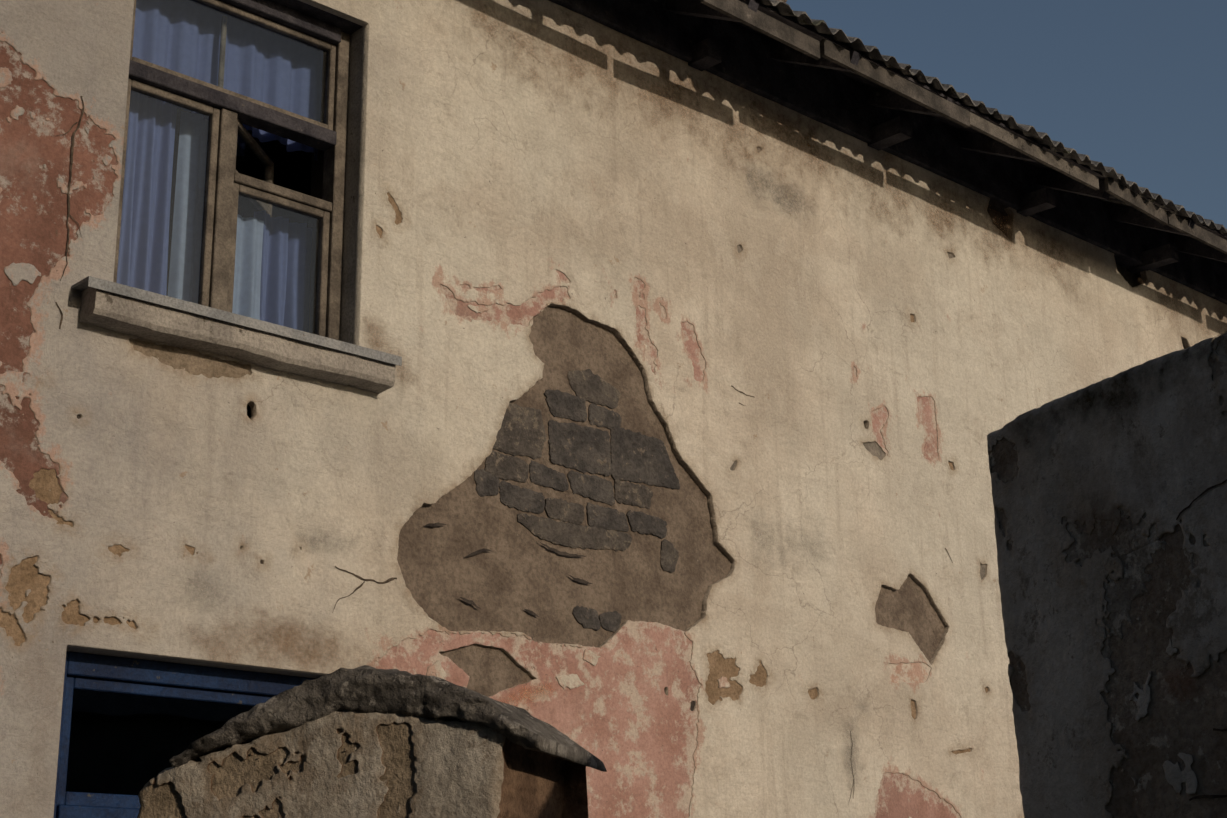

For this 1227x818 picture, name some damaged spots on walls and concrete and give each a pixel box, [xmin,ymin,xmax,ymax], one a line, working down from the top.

peeling [0,41,118,527]
peeling [989,438,1019,483]
crack [1176,479,1227,520]
flaking render [374,270,767,818]
peeling [0,554,50,646]
crack [332,566,397,613]
flaking render [875,575,945,663]
peeling [1009,651,1031,712]
peeling [137,777,186,818]
peeling [208,747,305,799]
peeling [337,729,360,778]
peeling [873,772,961,818]